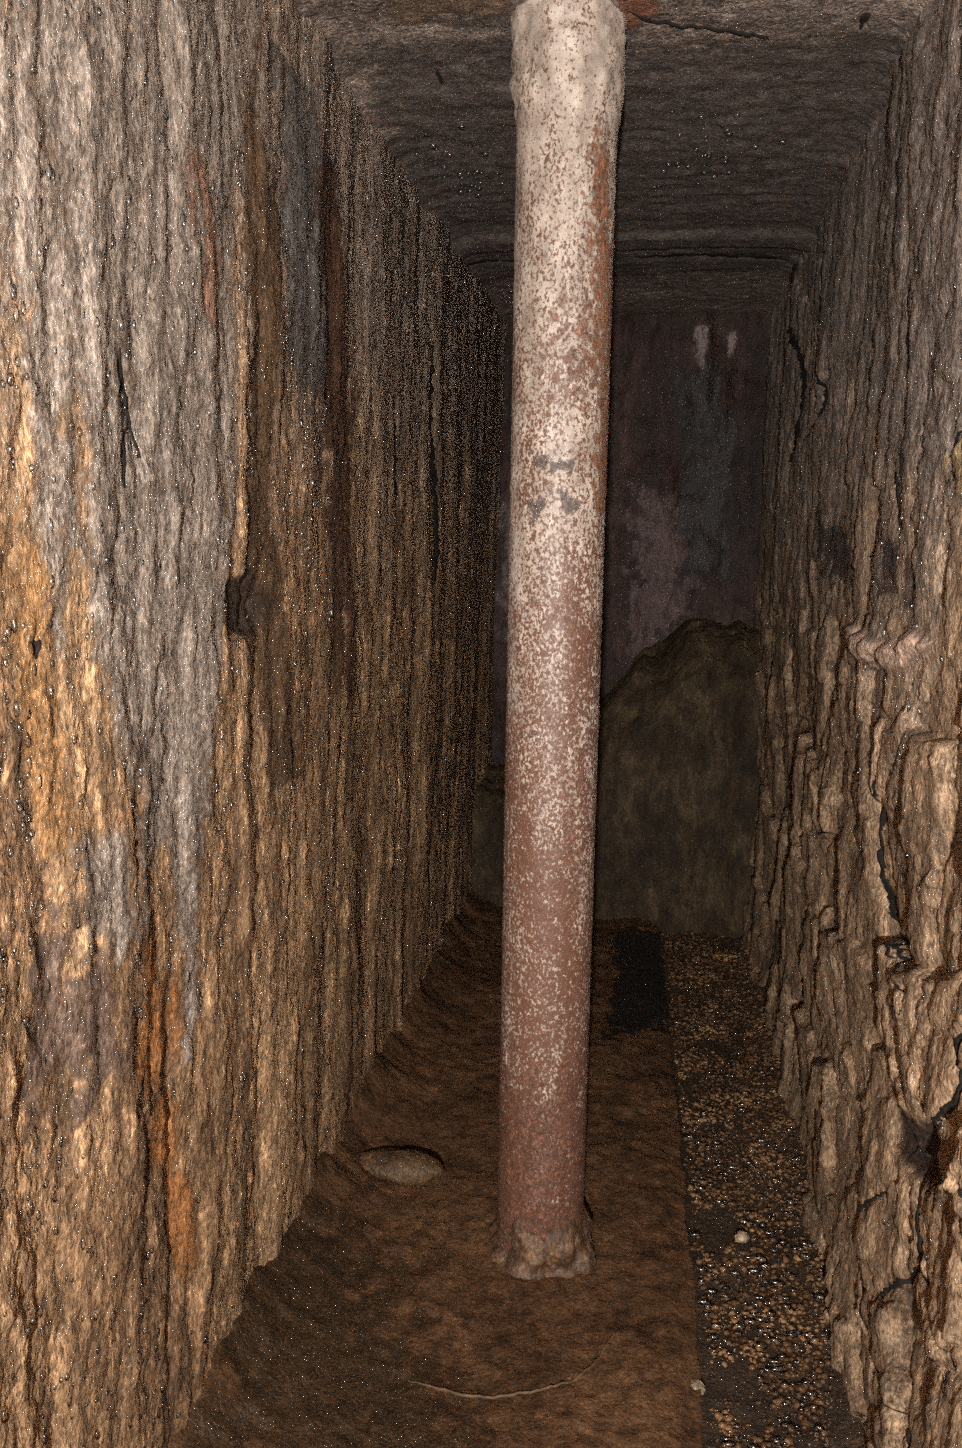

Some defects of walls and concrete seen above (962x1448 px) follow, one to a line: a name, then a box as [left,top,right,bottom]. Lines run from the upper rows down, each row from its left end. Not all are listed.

rust [529,115,705,658]
crack [894,283,911,526]
crack [951,430,962,481]
rust [503,581,603,945]
crack [872,780,913,992]
crack [931,1034,962,1127]
crack [858,1180,962,1448]